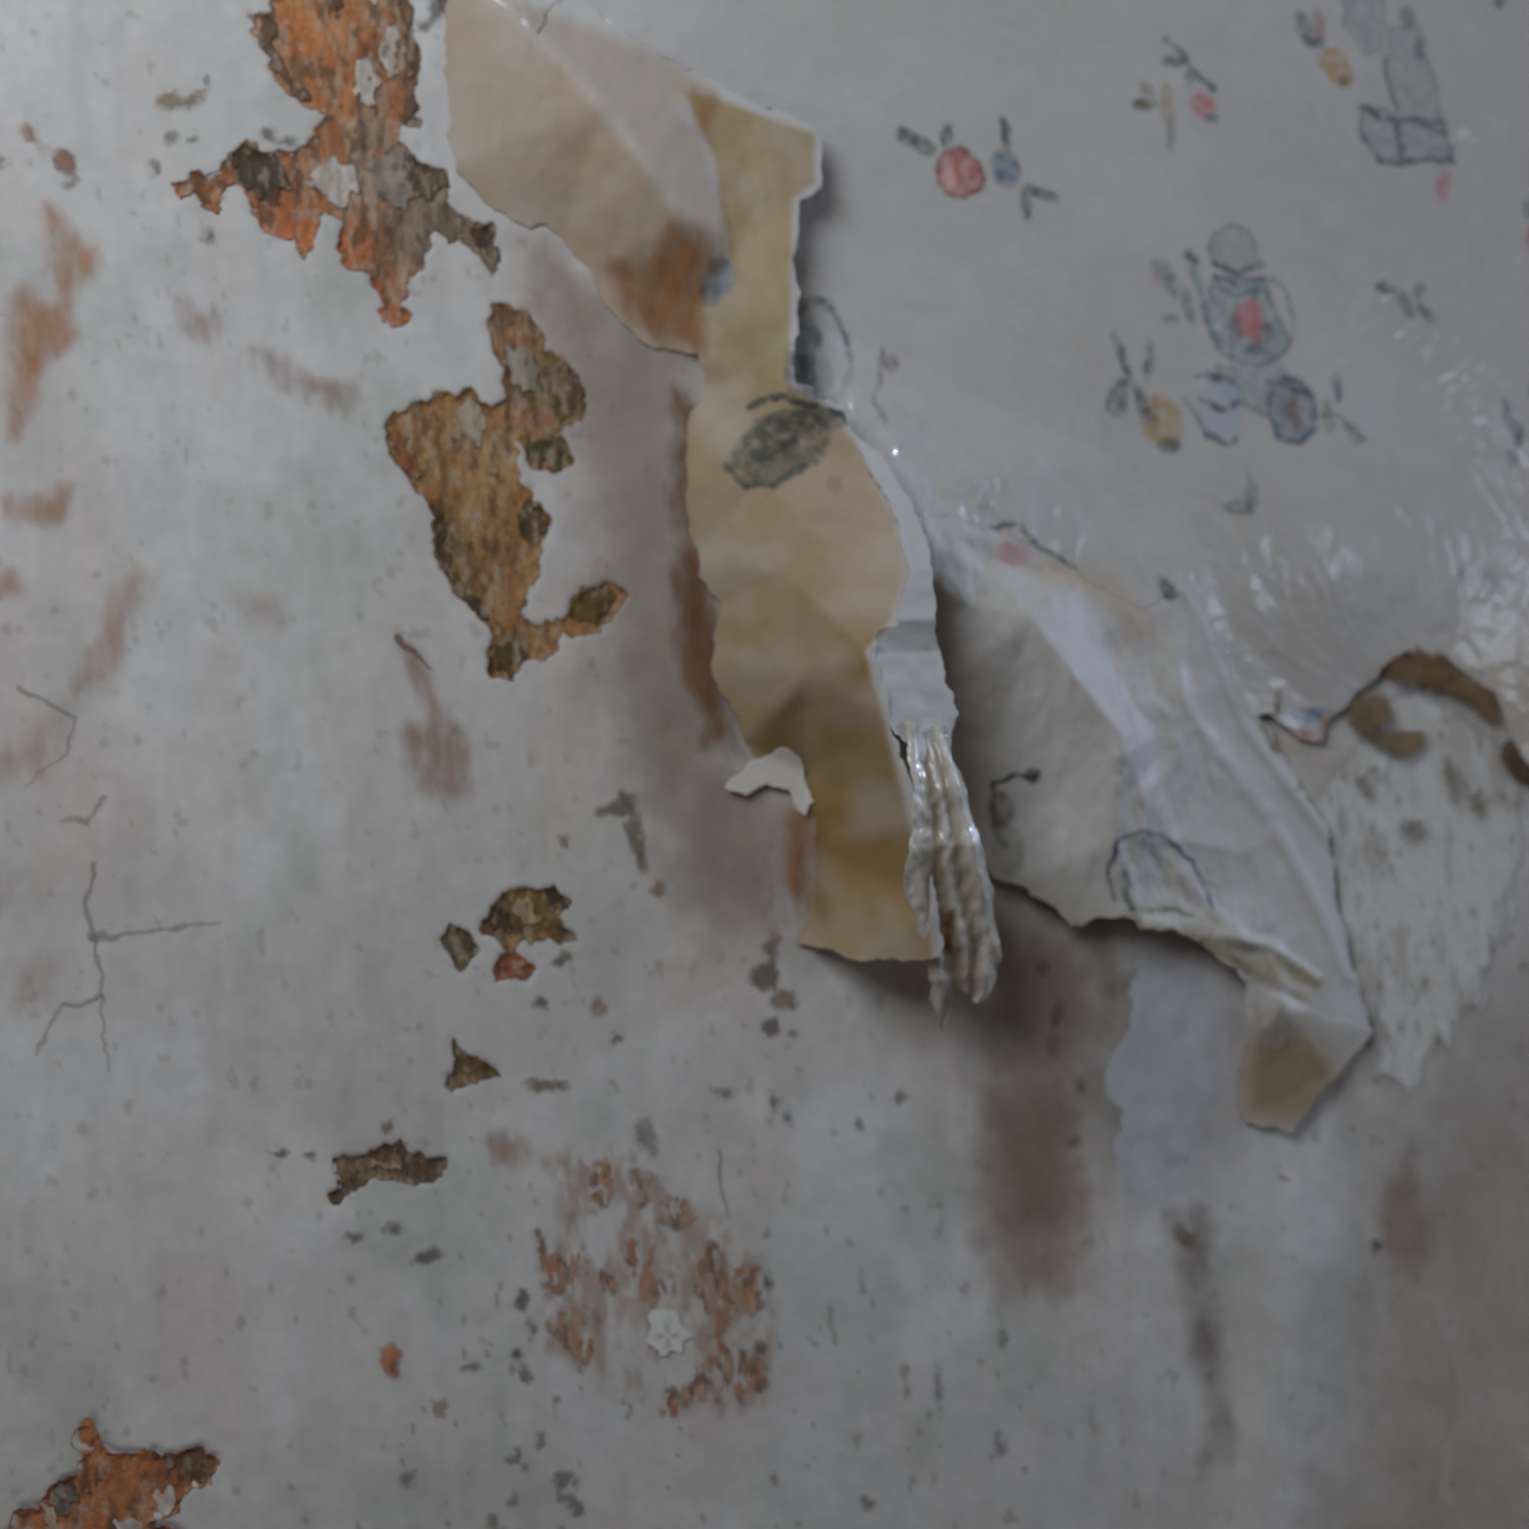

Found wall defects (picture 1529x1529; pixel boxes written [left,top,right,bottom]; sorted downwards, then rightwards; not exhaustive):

flaking render [154,0,501,327]
flaking render [384,302,628,680]
flaking render [598,792,645,868]
flaking render [439,883,577,982]
flaking render [752,938,795,1035]
flaking render [534,1081,562,1091]
flaking render [327,1125,447,1205]
flaking render [417,1249,437,1262]
flaking render [8,1417,219,1529]